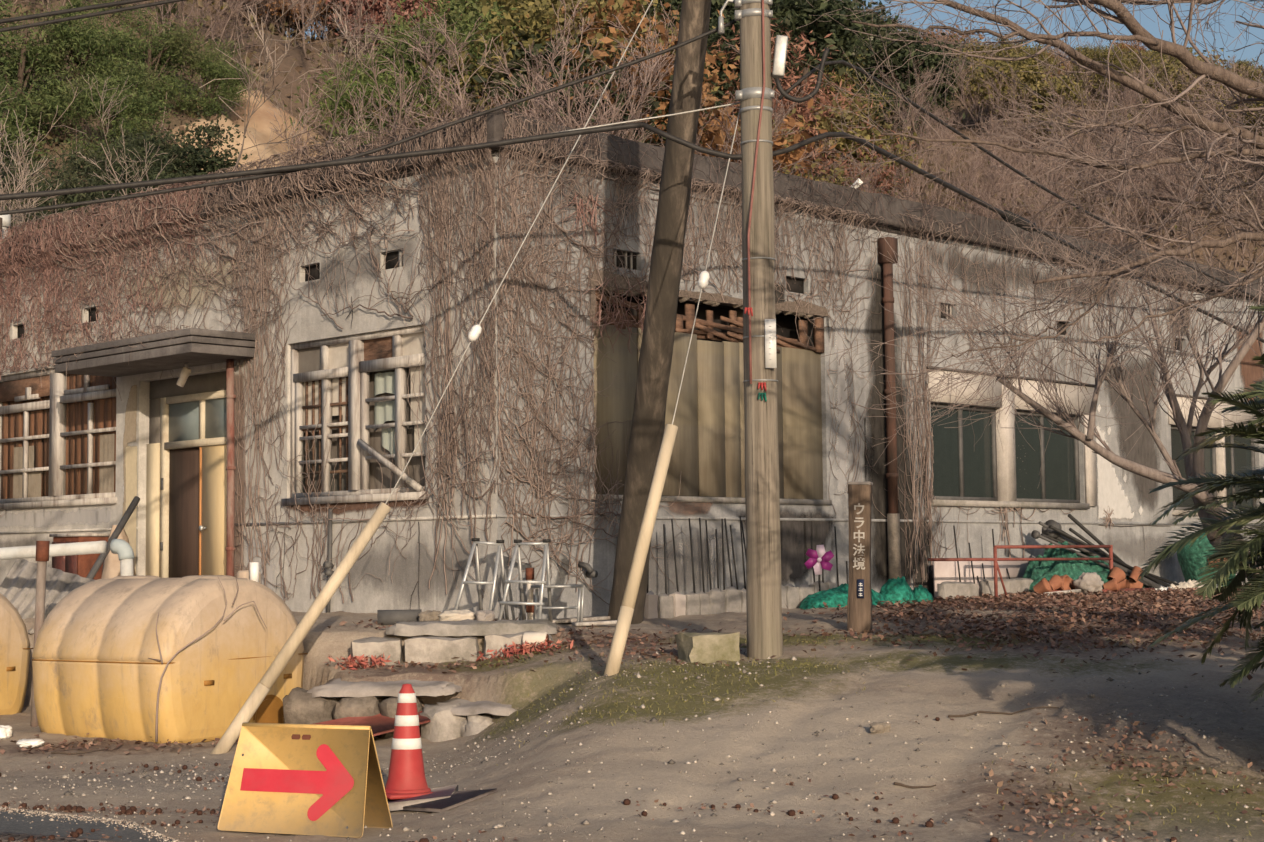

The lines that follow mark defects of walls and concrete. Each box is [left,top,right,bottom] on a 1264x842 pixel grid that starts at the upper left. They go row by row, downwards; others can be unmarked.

leakage [934,252,1120,302]